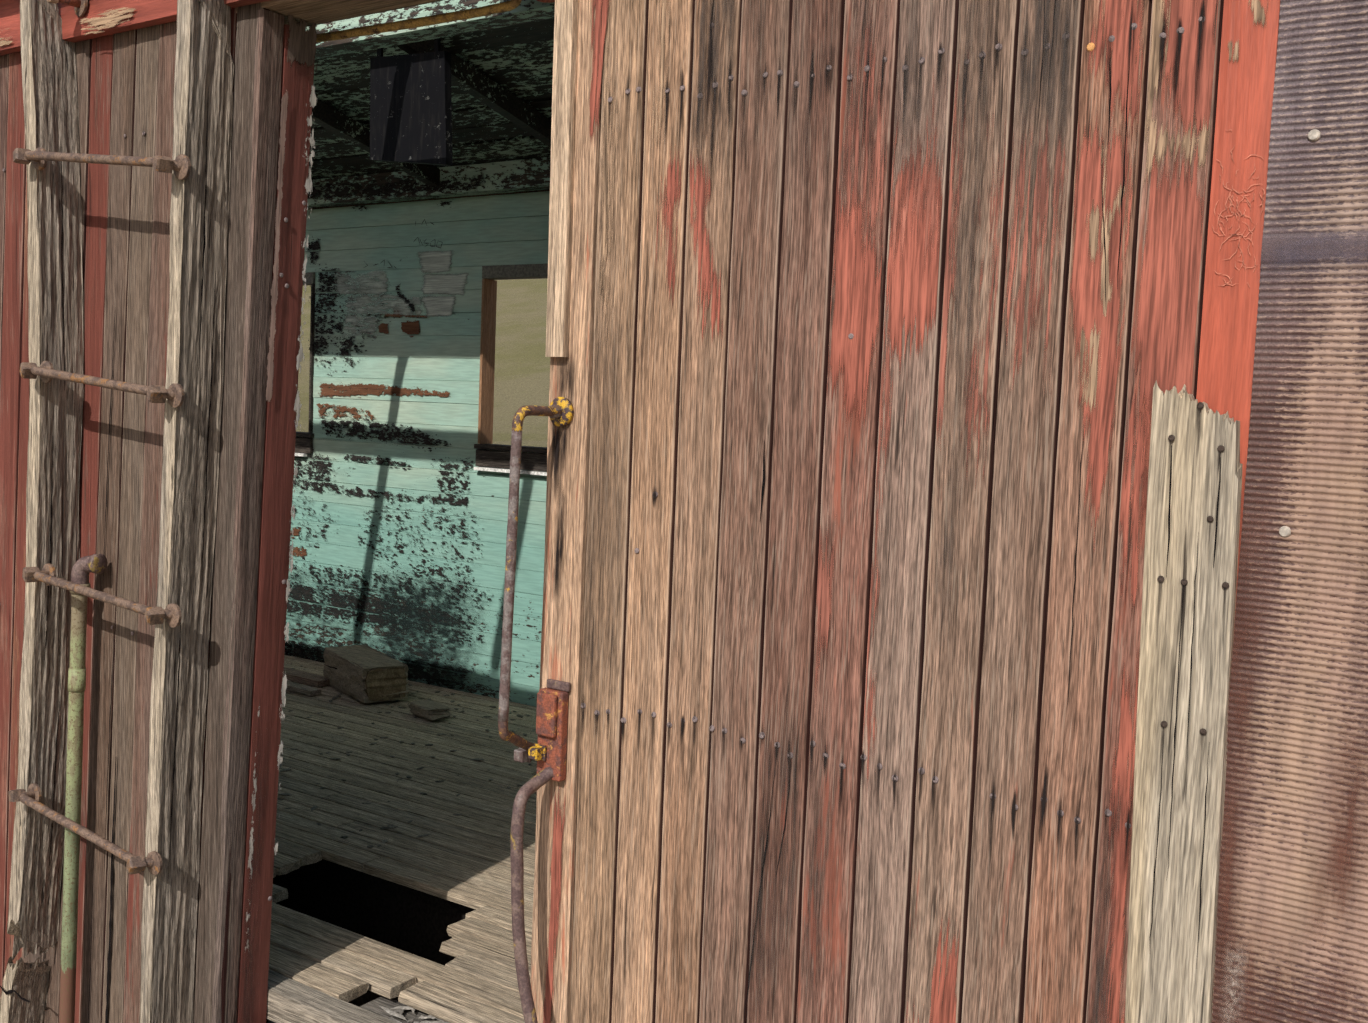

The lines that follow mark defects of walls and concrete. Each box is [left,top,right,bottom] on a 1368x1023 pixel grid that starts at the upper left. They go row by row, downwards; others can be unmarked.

peeling [80,7,135,35]
peeling [1249,0,1268,26]
peeling [651,0,723,340]
peeling [284,83,503,663]
peeling [827,0,1239,781]
peeling [279,673,287,721]
peeling [376,649,489,692]
peeling [814,518,834,697]